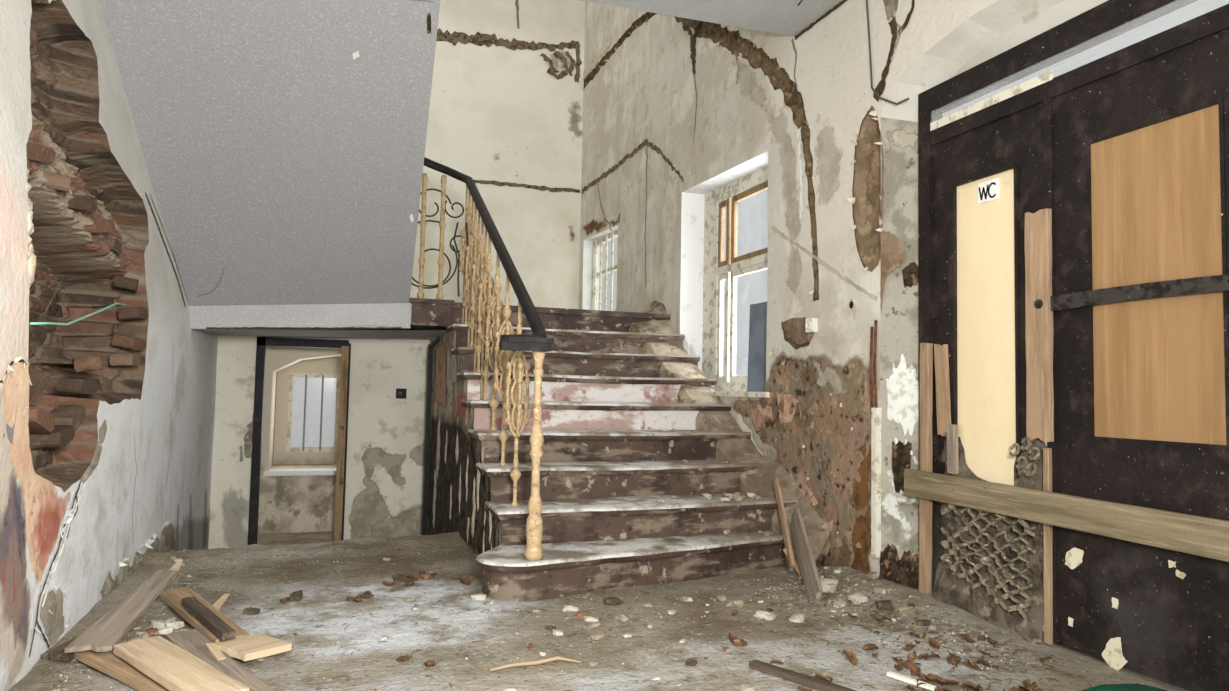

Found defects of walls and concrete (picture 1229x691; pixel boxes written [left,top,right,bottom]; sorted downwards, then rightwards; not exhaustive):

crack [414,0,847,301]
peeling [728,53,801,291]
flaking render [812,0,918,312]
crack [0,357,29,383]
spalling [0,0,149,646]
peeling [743,378,812,461]
flaking render [769,317,814,365]
peeling [814,361,853,431]
peeling [0,580,26,685]
leakage [0,477,70,645]
crack [29,481,86,657]